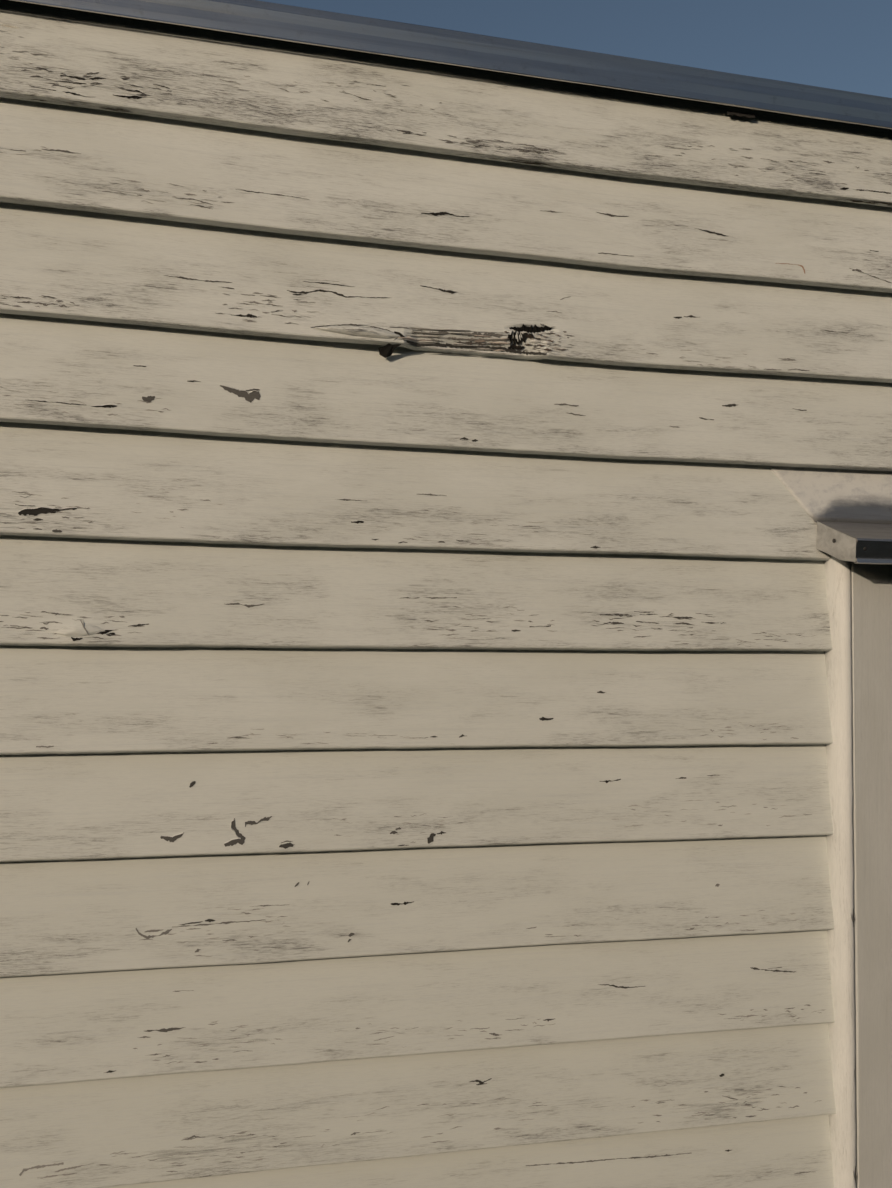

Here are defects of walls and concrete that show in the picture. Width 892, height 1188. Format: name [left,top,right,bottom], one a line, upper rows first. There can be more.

peeling [0,47,170,99]
peeling [439,135,557,154]
peeling [729,148,892,194]
peeling [520,324,574,351]
peeling [220,384,261,403]
peeling [0,491,95,532]
peeling [160,832,184,842]
peeling [224,816,272,847]
crack [750,965,795,973]
crack [599,982,645,990]